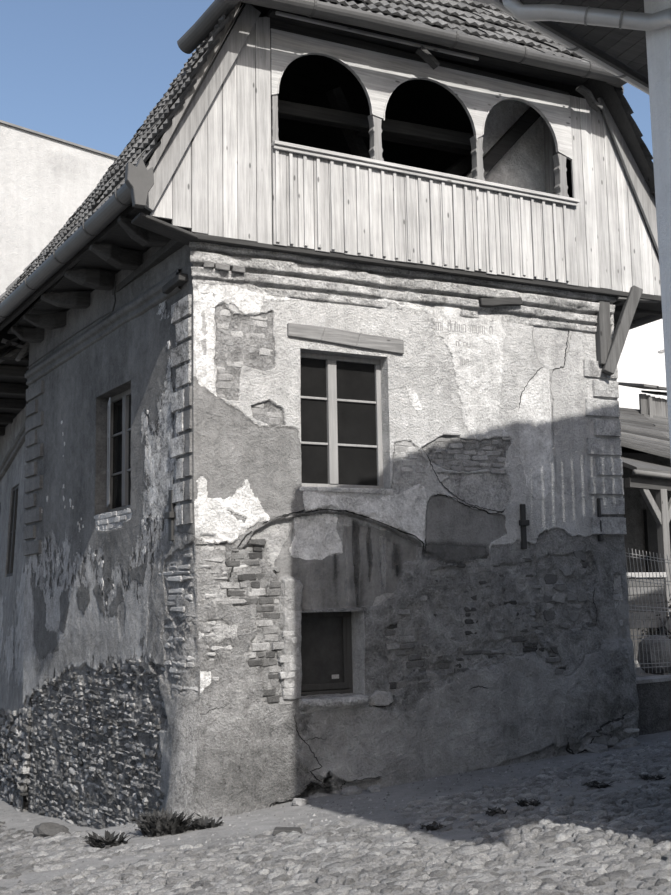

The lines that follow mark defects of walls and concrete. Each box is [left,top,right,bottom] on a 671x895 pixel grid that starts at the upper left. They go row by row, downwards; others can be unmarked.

crack [519,321,572,487]
spalling [0,304,640,820]
crack [269,714,384,807]